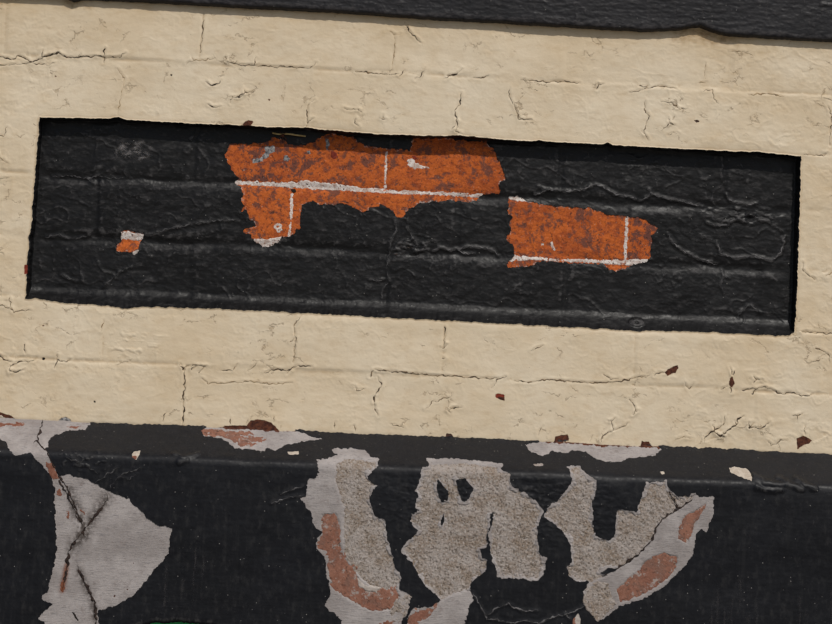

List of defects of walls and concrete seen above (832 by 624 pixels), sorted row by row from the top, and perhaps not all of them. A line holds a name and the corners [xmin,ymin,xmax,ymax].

crack [0,49,125,111]
crack [192,21,314,69]
crack [446,73,488,132]
peeling [225,133,505,247]
peeling [506,196,658,272]
crack [163,318,309,422]
crack [356,327,662,442]
peeling [201,419,321,455]
peeling [525,434,661,466]
crack [675,416,782,446]
peeling [0,412,172,624]
peeling [300,448,714,624]